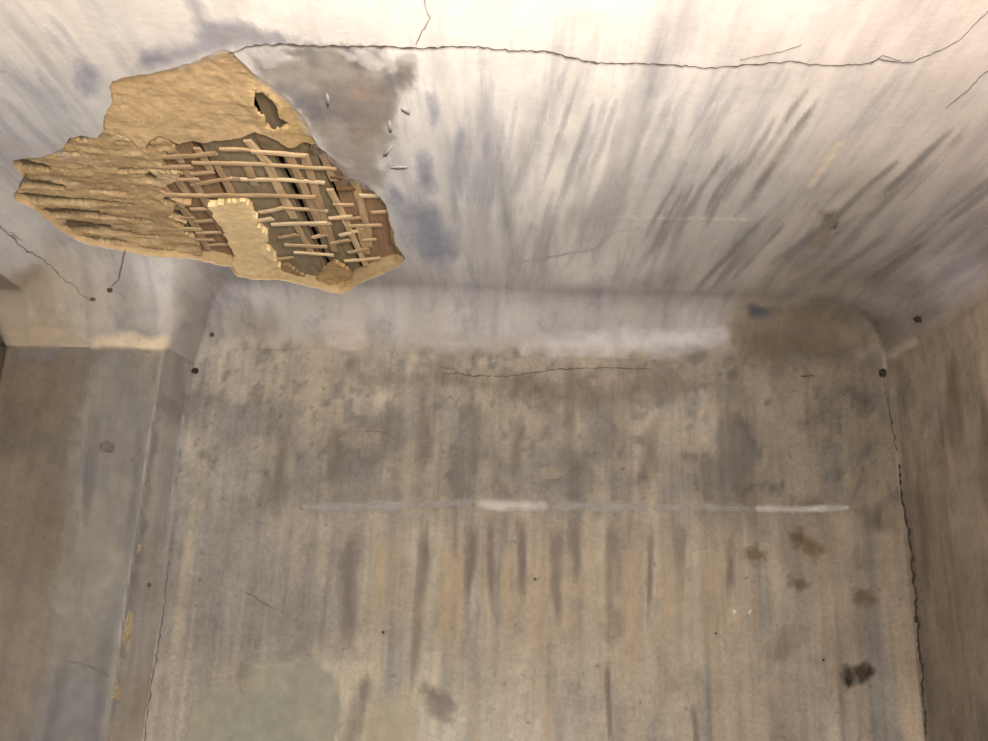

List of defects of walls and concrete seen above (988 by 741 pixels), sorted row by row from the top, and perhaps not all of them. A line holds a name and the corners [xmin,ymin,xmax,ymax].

crack [228,0,988,69]
crack [0,226,126,299]
flaking render [13,43,416,294]
leakage [391,190,457,260]
leakage [534,107,616,262]
leakage [751,103,814,198]
leakage [781,139,942,280]
leakage [412,537,429,667]
leakage [442,523,526,625]
leakage [551,523,580,617]
crack [877,367,927,736]
leakage [842,662,875,688]